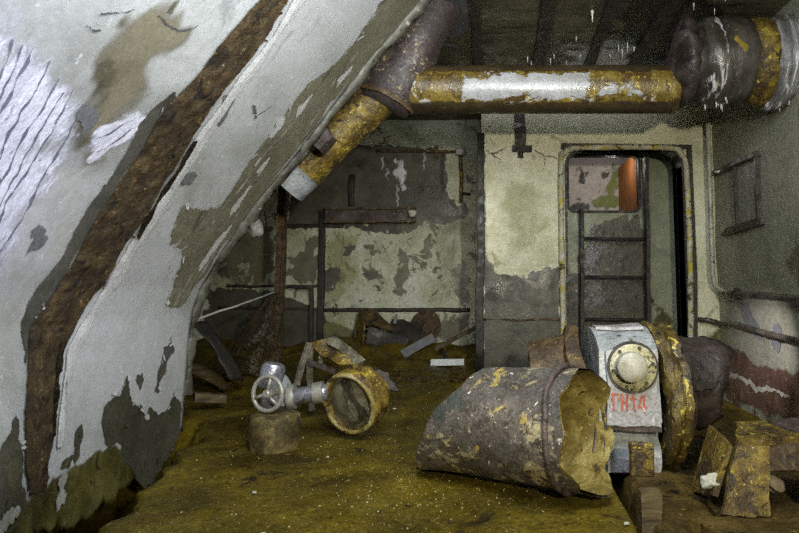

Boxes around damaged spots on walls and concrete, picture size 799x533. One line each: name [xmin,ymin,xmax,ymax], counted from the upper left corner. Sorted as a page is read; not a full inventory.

flaking render [21,92,176,362]
damp [0,0,198,271]
rust [132,138,198,240]
peeling [166,0,420,307]
peeling [286,144,469,296]
peeling [61,424,83,469]
peeling [102,373,182,488]
peeling [155,336,175,393]
rust [726,349,799,419]